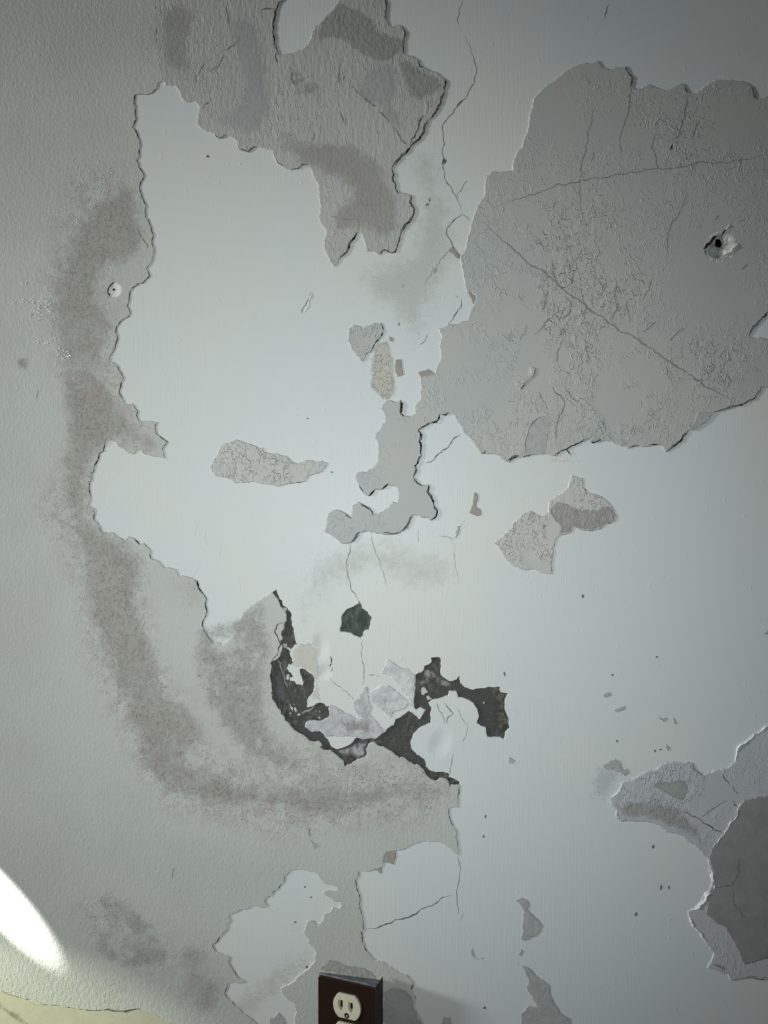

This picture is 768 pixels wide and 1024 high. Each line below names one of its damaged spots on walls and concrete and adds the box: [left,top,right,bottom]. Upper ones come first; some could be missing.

crack [424,5,477,286]
peeling [324,61,768,544]
peeling [0,0,510,1024]
damp [293,643,319,699]
crack [365,859,461,930]
peeling [603,723,768,981]